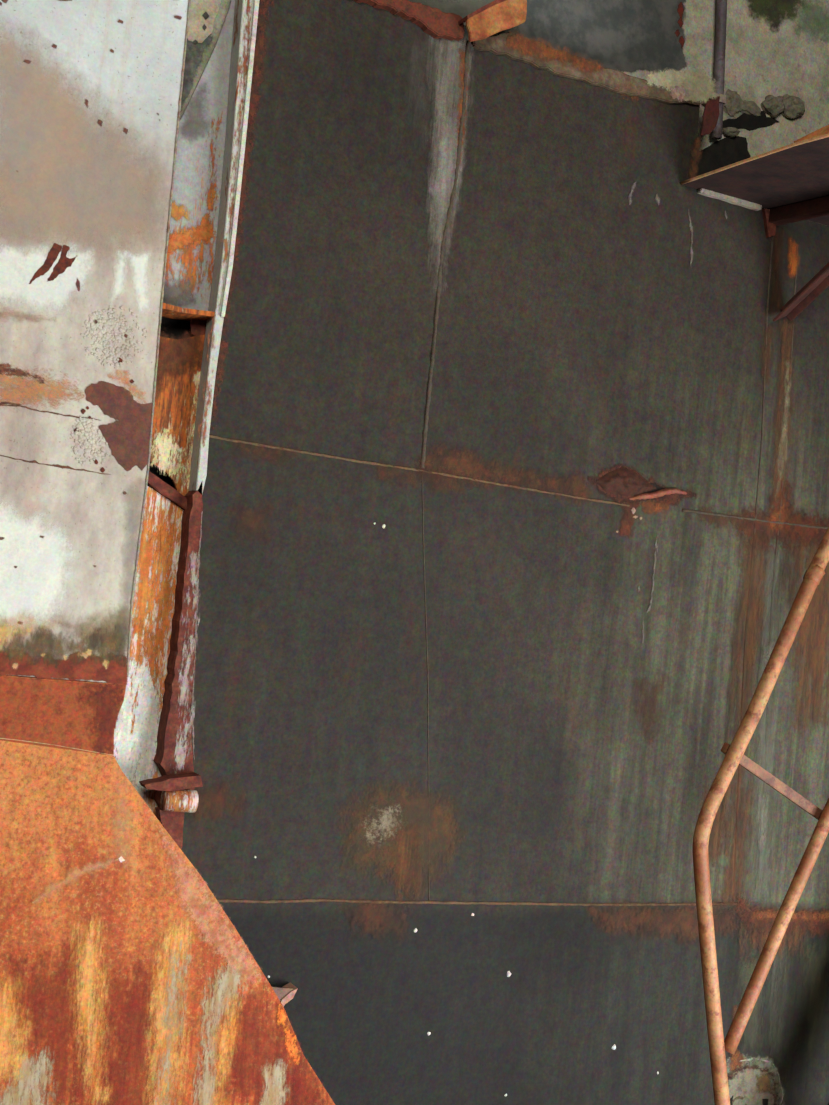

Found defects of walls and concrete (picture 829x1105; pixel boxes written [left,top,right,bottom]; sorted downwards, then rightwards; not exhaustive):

peeling [174,0,221,44]
peeling [408,0,494,25]
leakage [0,42,153,245]
leakage [430,38,469,270]
peeling [494,0,805,176]
corrosion [0,358,153,471]
corrosion [620,500,669,537]
corrosion [0,518,181,733]
corrosion [779,909,829,954]
corrosion [11,920,192,1105]
corrosion [225,997,329,1105]
spalling [726,1050,785,1105]